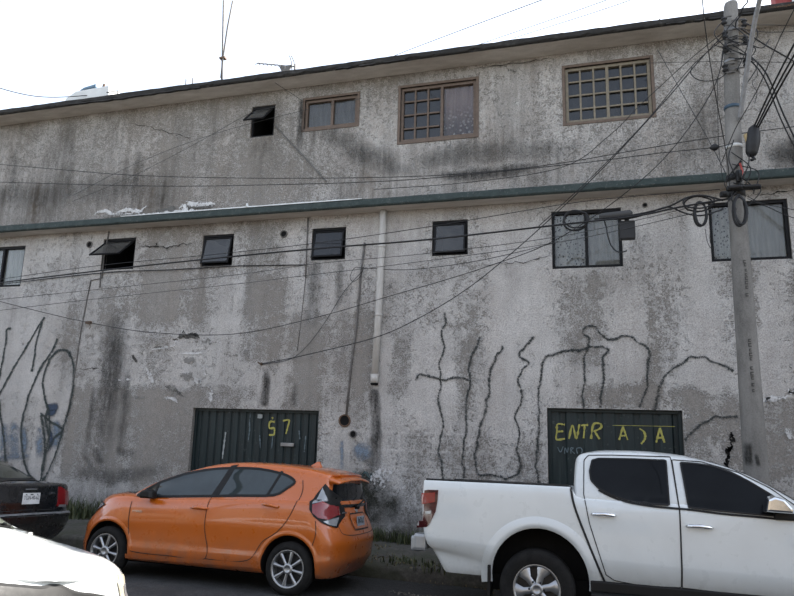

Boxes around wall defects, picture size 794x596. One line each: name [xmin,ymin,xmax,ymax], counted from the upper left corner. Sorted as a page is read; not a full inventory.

water stain [447,166,522,179]
peeling [95,201,215,218]
peeling [150,330,217,403]
water stain [371,391,380,449]
peeling [763,388,794,403]
water stain [360,462,398,518]